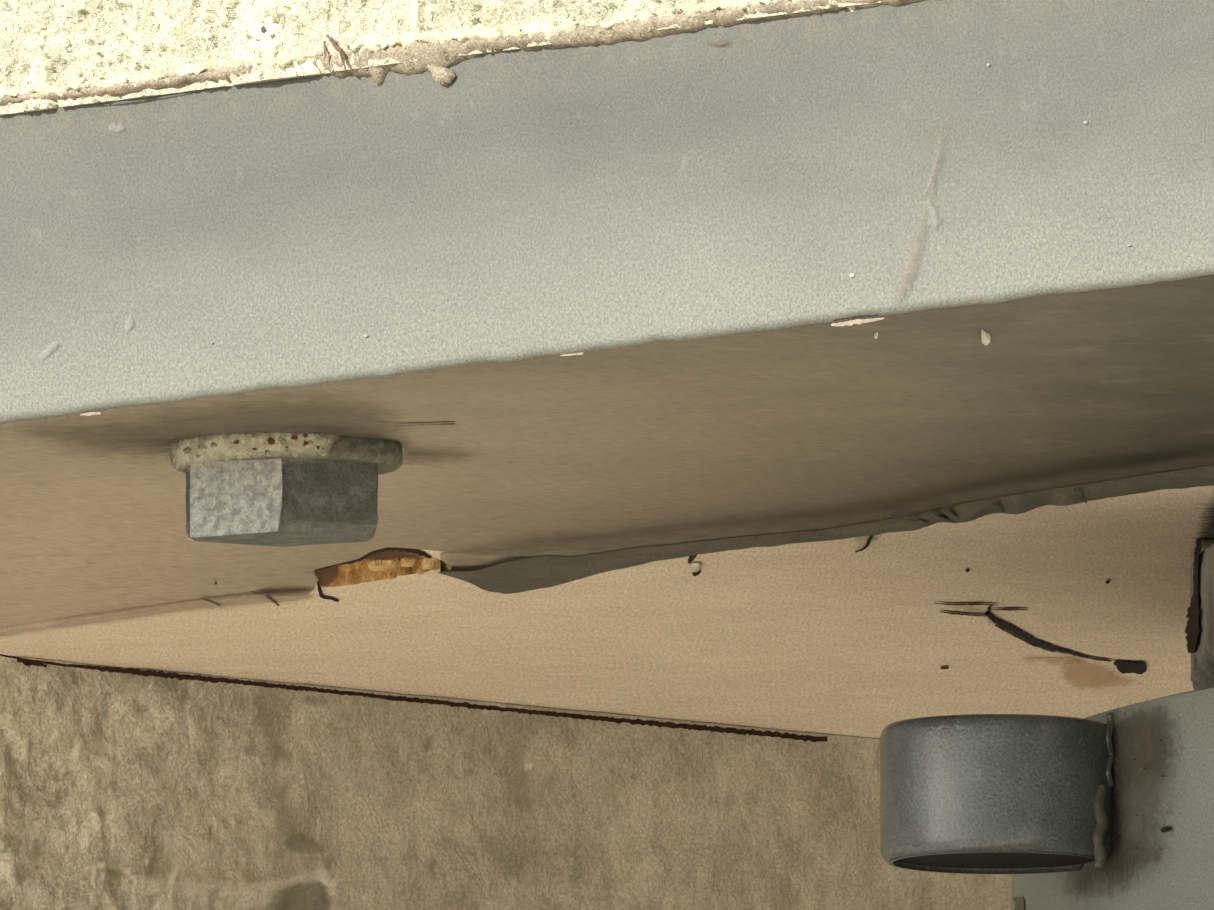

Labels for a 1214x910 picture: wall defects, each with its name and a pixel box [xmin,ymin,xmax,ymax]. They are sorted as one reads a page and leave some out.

spalling [313,547,453,602]
spalling [688,555,701,576]
crack [1185,538,1203,653]
crack [935,603,1147,688]